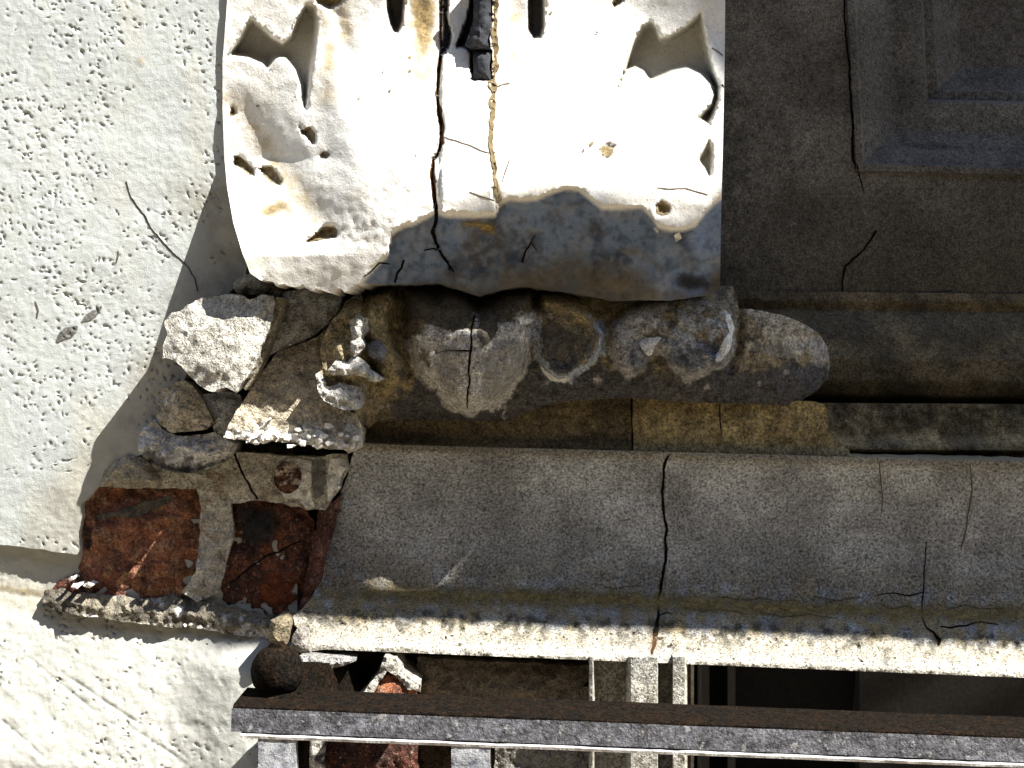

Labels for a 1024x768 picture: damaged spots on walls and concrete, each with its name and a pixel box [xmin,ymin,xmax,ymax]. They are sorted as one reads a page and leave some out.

spalling [465,0,491,81]
crack [126,181,198,292]
peeling [235,157,280,184]
peeling [301,128,314,143]
peeling [308,228,337,242]
crack [364,0,510,283]
peeling [656,201,670,215]
crack [843,0,865,193]
crack [841,230,877,292]
peeling [56,306,102,342]
crack [435,314,475,409]
crack [597,454,998,655]